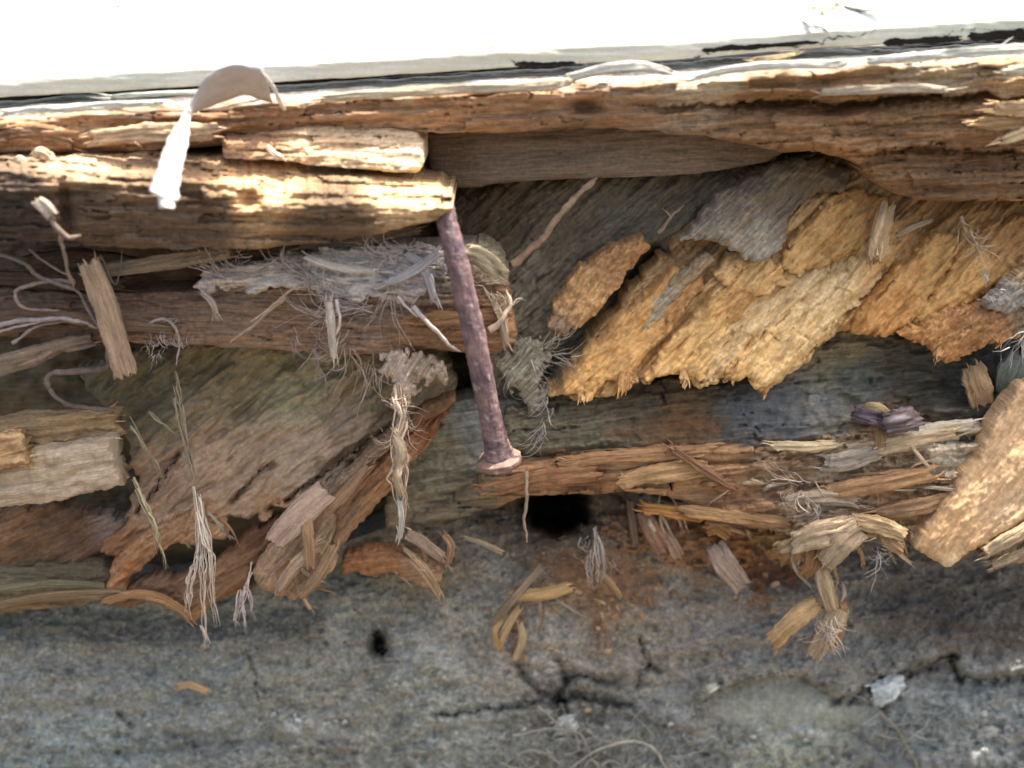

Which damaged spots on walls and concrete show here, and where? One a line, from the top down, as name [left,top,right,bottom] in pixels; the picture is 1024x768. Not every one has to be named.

crack [435,638,657,717]